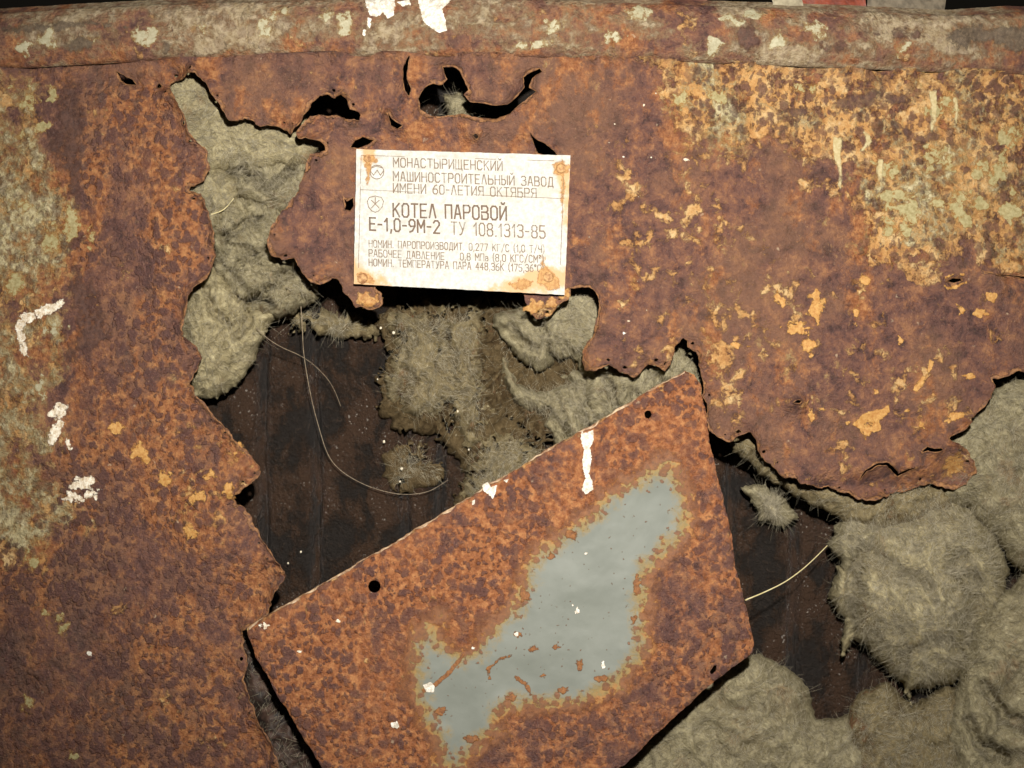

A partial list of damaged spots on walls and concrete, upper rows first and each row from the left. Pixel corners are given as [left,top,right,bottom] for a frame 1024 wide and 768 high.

peeling [418,64,542,140]
peeling [672,89,689,111]
corrosion [834,89,909,111]
peeling [870,123,1024,237]
corrosion [357,272,379,308]
corrosion [508,261,569,314]
corrosion [956,292,998,318]
corrosion [780,289,826,358]
peeling [107,417,126,435]
peeling [156,69,383,768]
corrosion [846,405,890,440]
peeling [130,440,151,465]